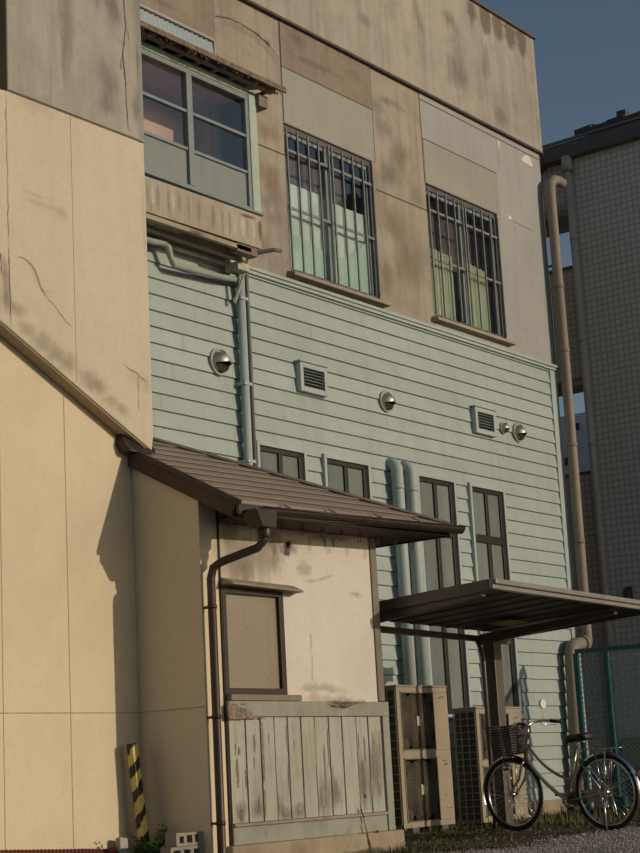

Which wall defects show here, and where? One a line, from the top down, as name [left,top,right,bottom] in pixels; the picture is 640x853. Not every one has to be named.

crack [121,2,131,136]
damp [469,4,525,55]
crack [1,140,70,325]
peeling [314,726,340,807]